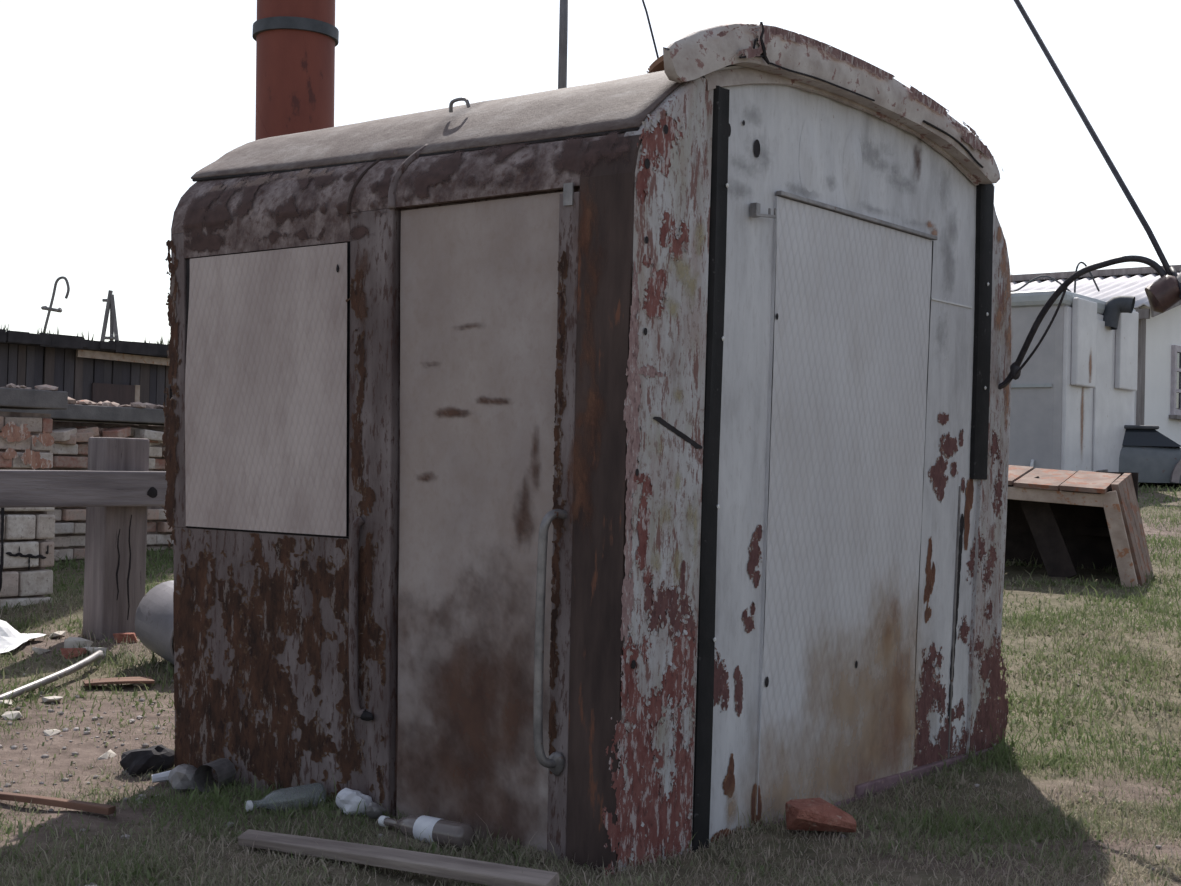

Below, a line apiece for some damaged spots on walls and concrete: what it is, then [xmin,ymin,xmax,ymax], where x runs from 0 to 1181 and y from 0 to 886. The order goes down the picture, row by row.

peeling [717,24,1004,172]
corrosion [402,143,538,202]
corrosion [553,132,630,175]
corrosion [162,163,393,803]
corrosion [516,443,538,536]
peeling [928,413,965,502]
peeling [602,210,697,876]
peeling [747,524,762,588]
peeling [714,647,743,717]
peeling [913,534,1010,767]
corrosion [369,641,544,845]
corrosion [711,753,763,842]